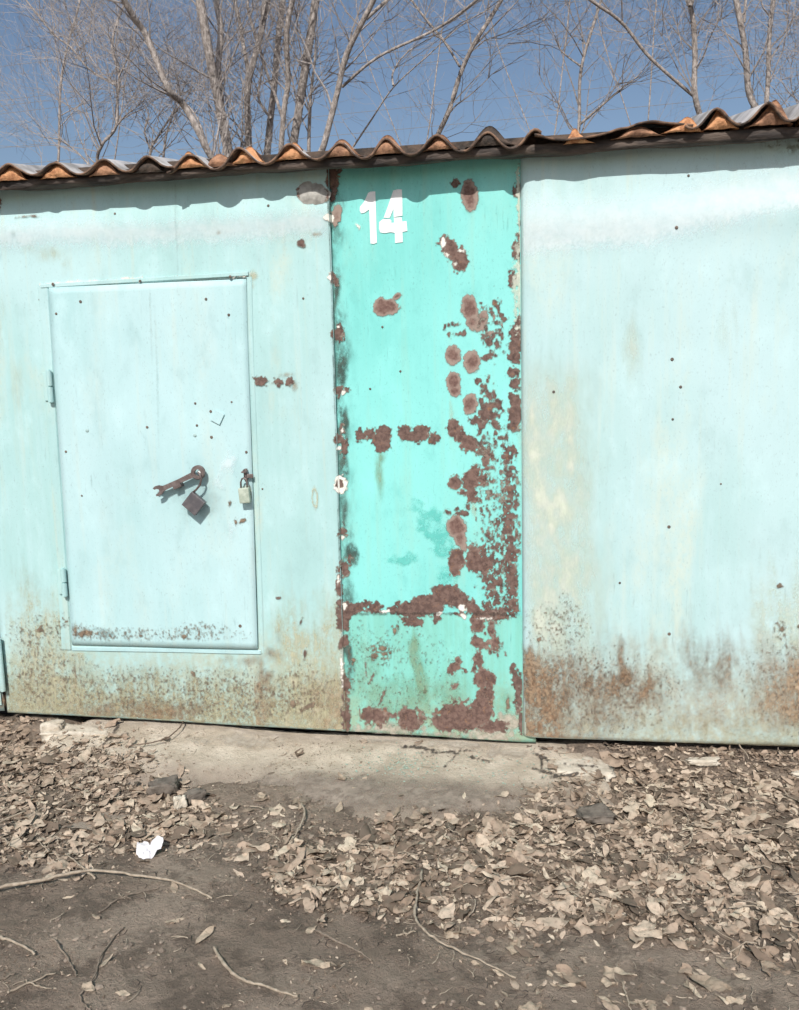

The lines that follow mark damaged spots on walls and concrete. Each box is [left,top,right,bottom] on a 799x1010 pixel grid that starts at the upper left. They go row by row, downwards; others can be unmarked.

peeling [330,323,345,343]
peeling [333,167,642,757]
corrosion [312,681,347,729]
corrosion [523,646,659,738]
corrosion [757,654,799,724]